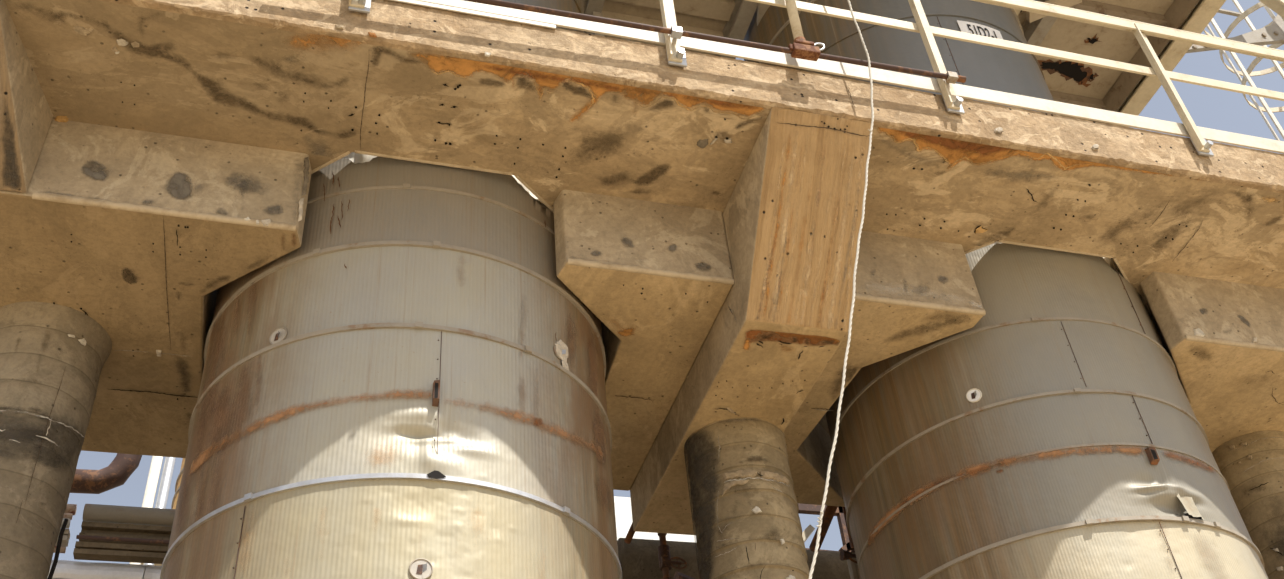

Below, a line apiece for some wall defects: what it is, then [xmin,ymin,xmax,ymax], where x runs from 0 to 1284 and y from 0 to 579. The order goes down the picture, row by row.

damp [103,24,312,128]
rust [416,53,763,121]
damp [4,119,20,187]
damp [82,161,107,180]
damp [168,173,192,199]
rust [878,127,1171,176]
rust [743,317,840,350]
damp [0,410,84,463]
rust [190,391,431,473]
rust [484,406,603,455]
rust [868,446,1142,546]